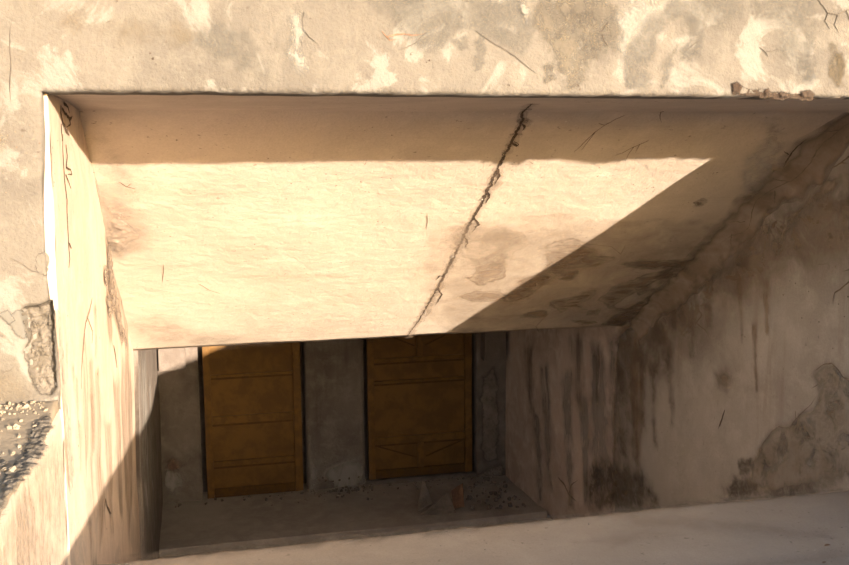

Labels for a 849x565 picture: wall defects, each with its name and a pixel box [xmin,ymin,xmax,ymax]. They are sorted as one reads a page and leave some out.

crack [818,0,849,31]
crack [476,31,535,73]
spalling [732,82,815,101]
crack [60,102,72,263]
crack [407,104,533,336]
damp [461,245,601,301]
damp [527,260,686,326]
spalling [0,299,75,491]
damp [582,327,670,509]
damp [727,460,757,495]